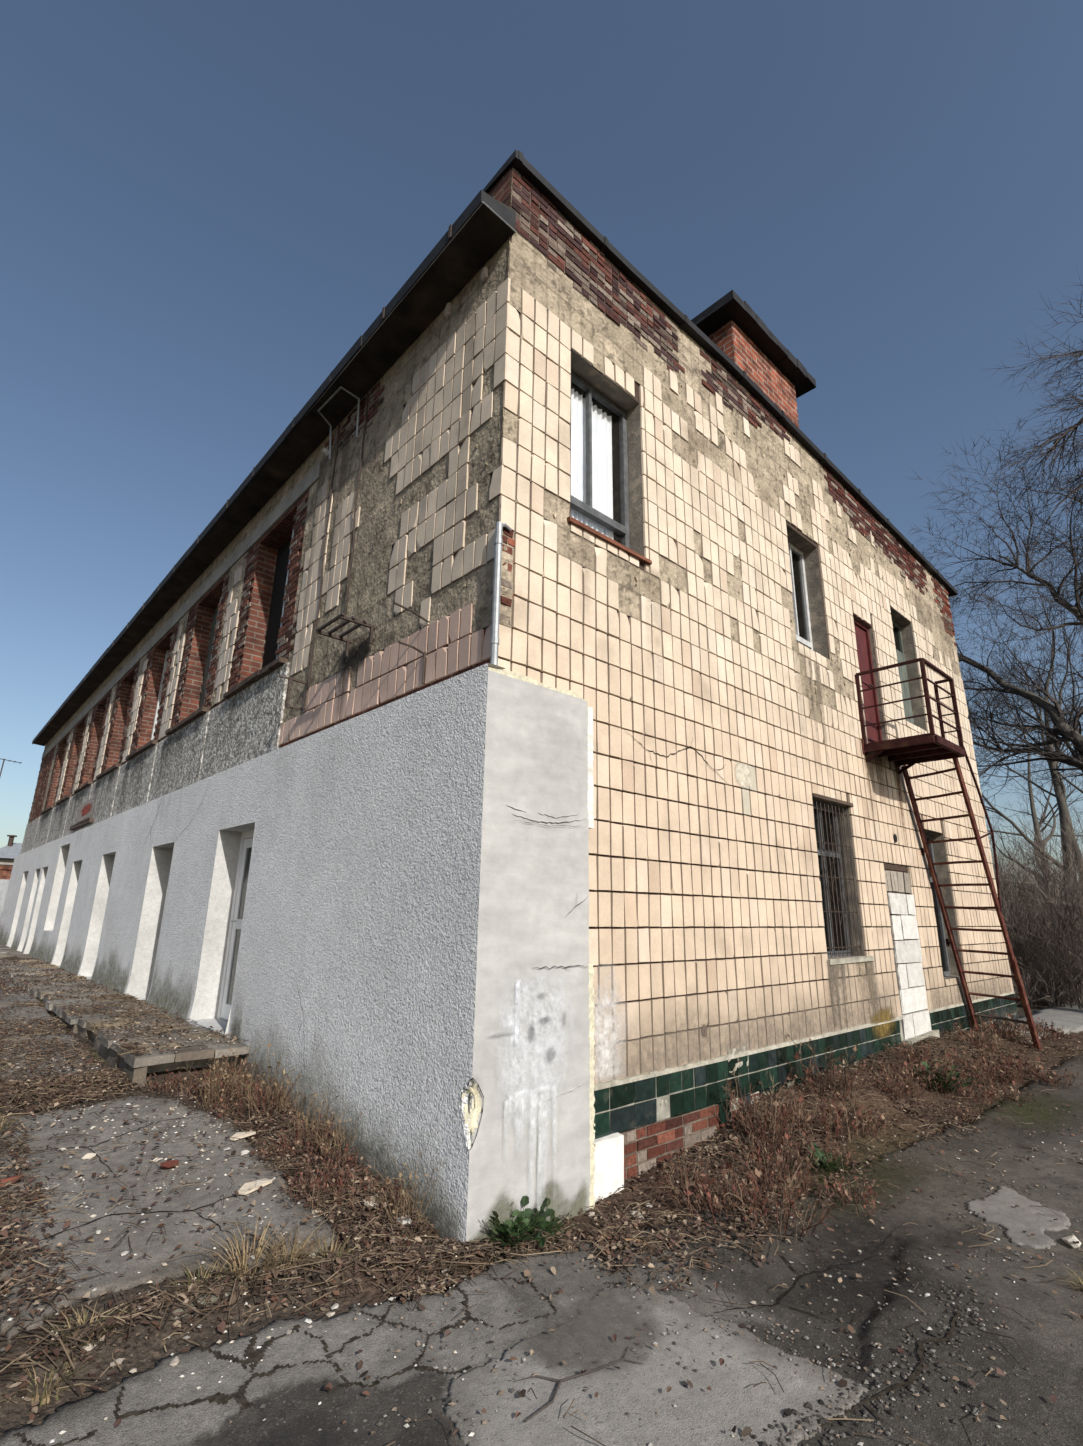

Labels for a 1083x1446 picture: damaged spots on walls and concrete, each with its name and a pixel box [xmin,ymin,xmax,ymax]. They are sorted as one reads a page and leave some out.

spalling [28,168,962,823]
rust [865,755,904,826]
spalling [460,1078,484,1151]
water stain [476,980,587,1245]
crack [13,1277,557,1446]